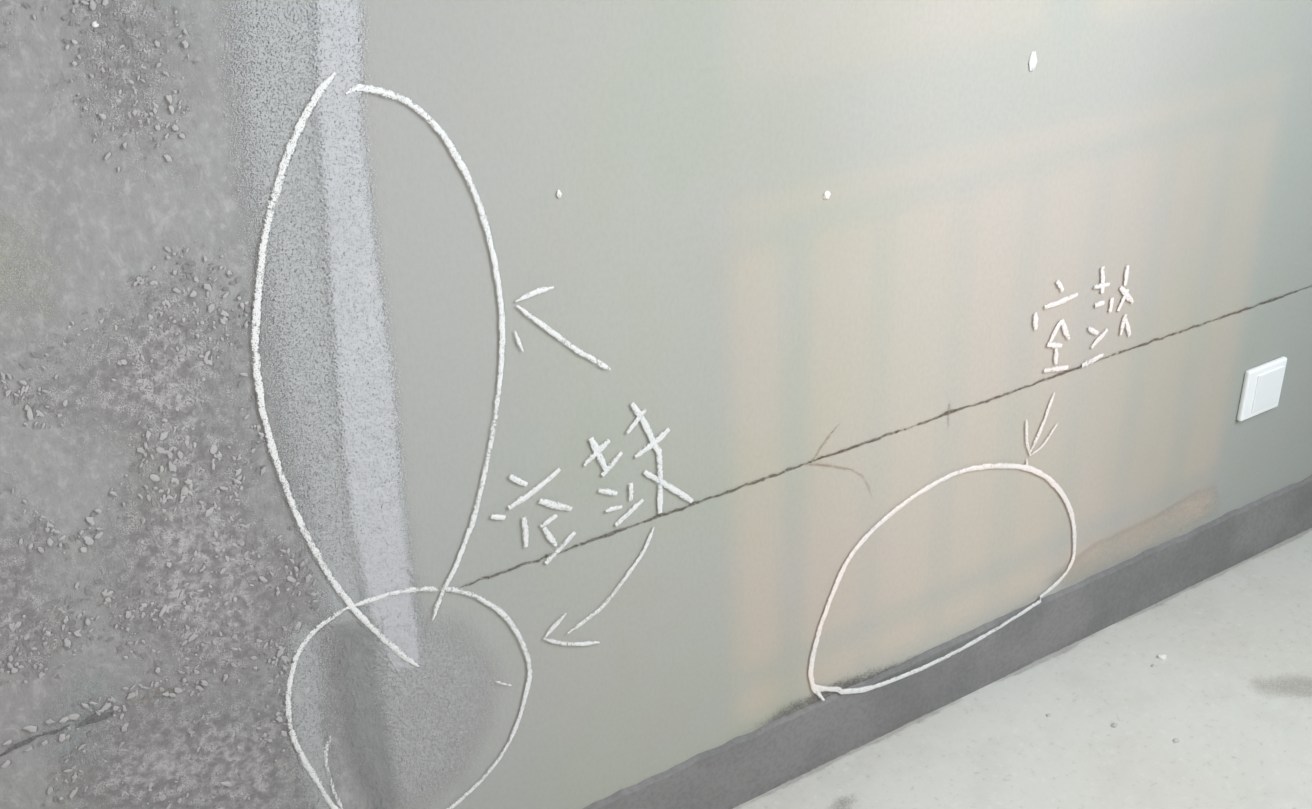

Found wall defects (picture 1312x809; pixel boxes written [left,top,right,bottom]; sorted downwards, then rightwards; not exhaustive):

crack [462,287,1307,587]